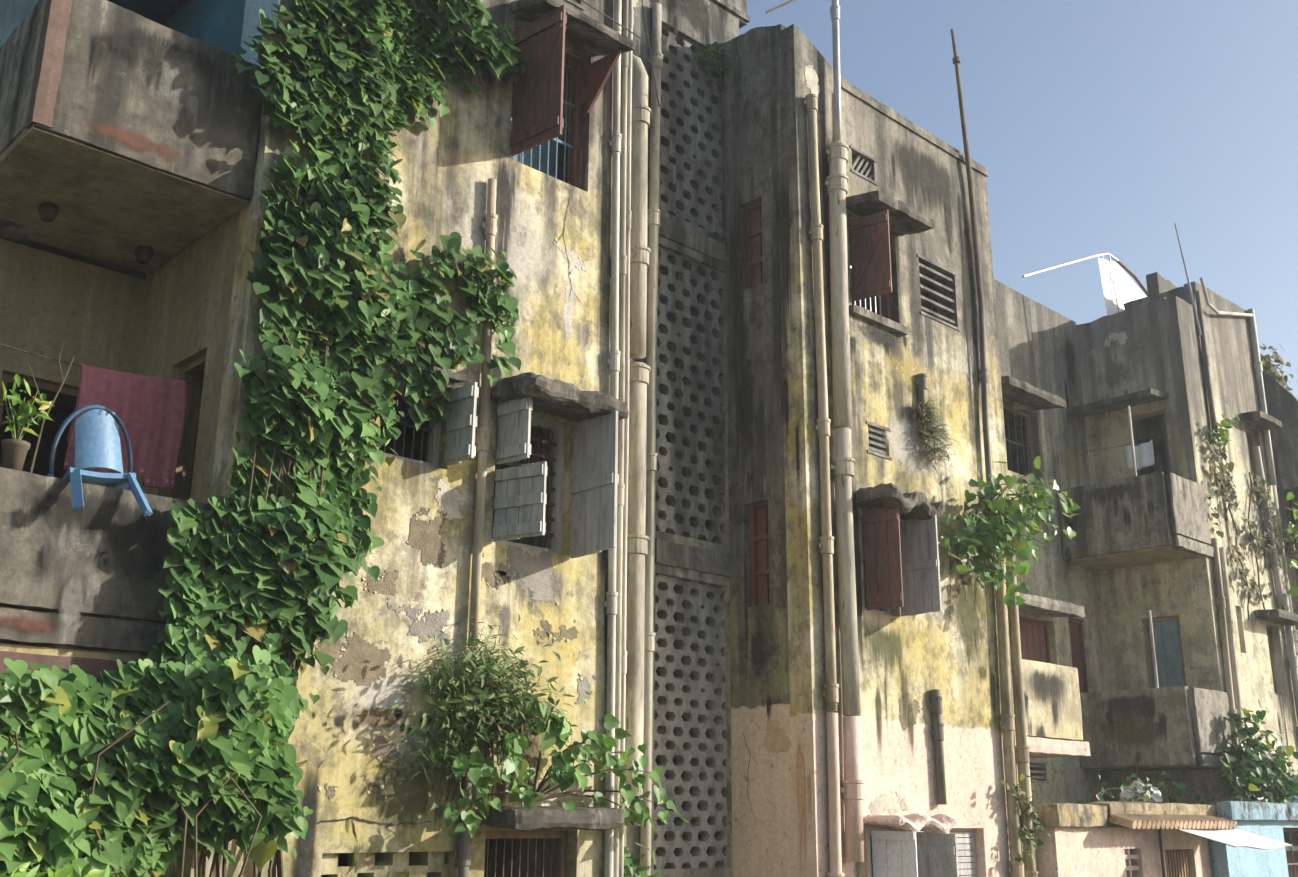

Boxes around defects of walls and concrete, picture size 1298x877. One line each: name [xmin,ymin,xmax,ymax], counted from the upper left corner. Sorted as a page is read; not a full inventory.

water stain [822,129,833,301]
water stain [892,145,989,431]
efflorescence [887,421,945,498]
peeling [407,479,465,568]
peeling [314,632,391,687]
peeling [355,557,450,653]
spalling [481,545,563,605]
peeling [534,620,579,643]
water stain [852,485,914,748]
water stain [966,631,996,719]
water stain [1024,671,1065,738]
crack [316,816,431,842]